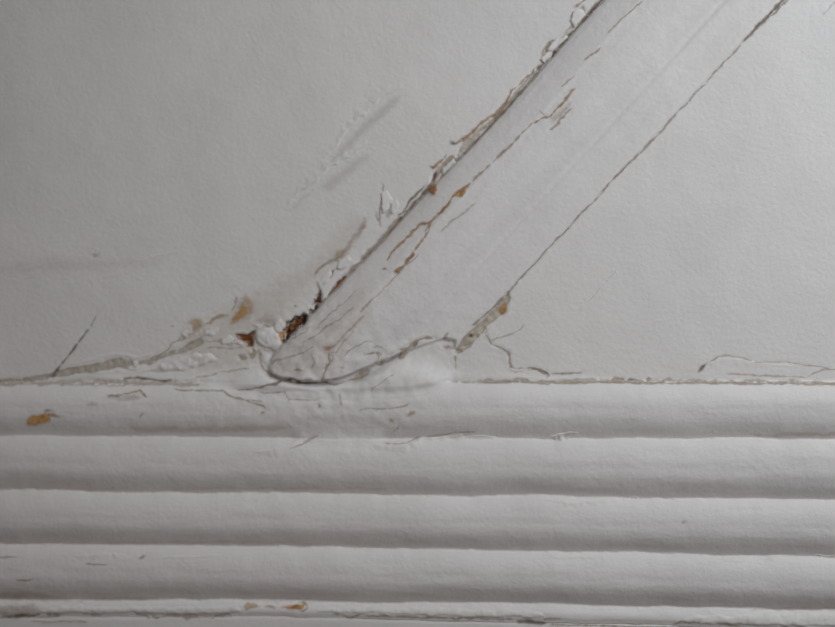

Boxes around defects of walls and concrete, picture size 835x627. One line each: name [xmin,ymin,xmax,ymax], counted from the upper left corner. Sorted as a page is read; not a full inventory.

spalling [429,0,585,195]
crack [511,0,788,289]
crack [0,0,602,413]
peeling [384,184,470,273]
spalling [8,256,352,381]
spalling [356,333,432,379]
spalling [443,291,513,368]
crack [454,326,835,385]
rust [28,410,56,425]